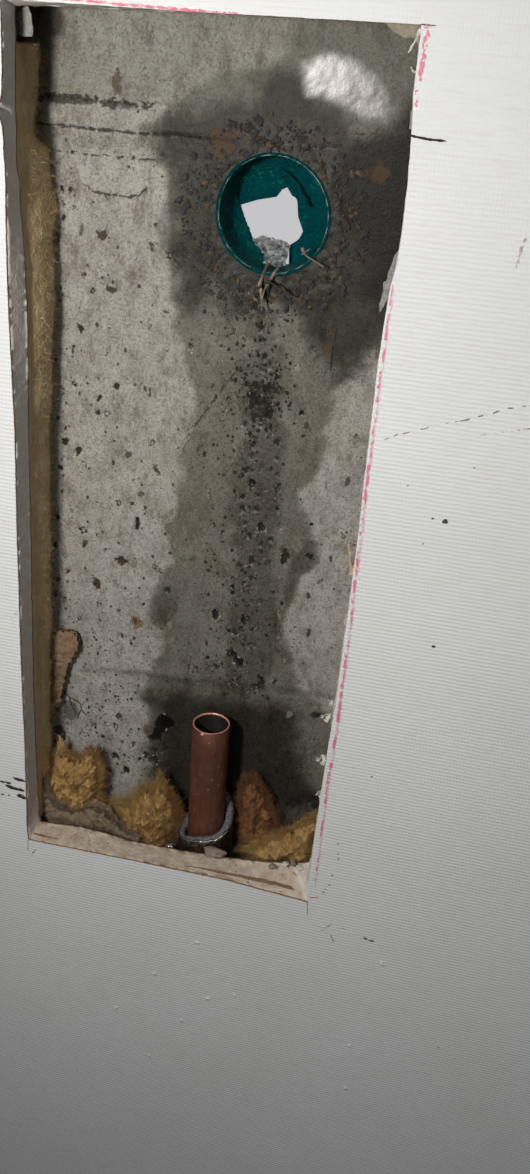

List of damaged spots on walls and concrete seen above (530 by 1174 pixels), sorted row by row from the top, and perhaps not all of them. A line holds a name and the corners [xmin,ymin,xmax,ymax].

leakage [165,79,411,365]
leakage [151,695,308,834]